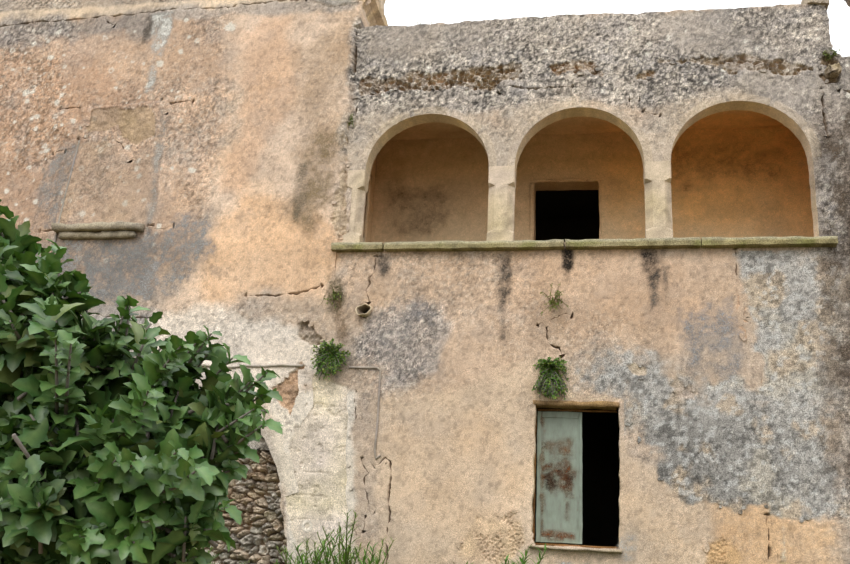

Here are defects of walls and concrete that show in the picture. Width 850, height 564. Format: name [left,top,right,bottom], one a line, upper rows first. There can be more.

crack [815,85,850,137]
water stain [815,113,850,277]
crack [246,280,322,302]
water stain [497,257,512,304]
water stain [641,249,666,307]
crack [535,306,573,356]
flaking render [561,227,850,564]
flaking render [267,316,358,562]
corrosion [541,440,576,497]
spalling [446,504,535,564]
corrosion [541,522,574,540]
crack [760,515,780,564]